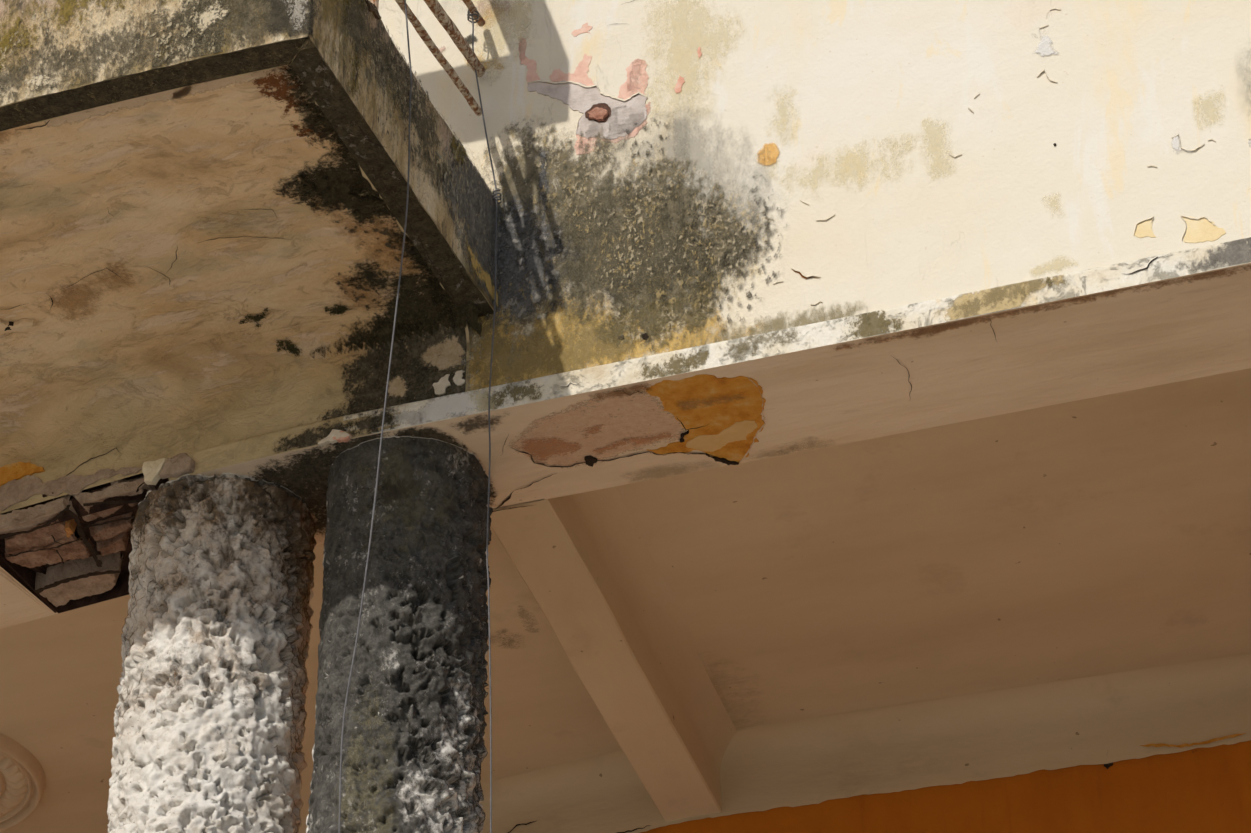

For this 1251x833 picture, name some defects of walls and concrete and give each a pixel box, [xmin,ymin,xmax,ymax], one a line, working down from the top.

flaking render [571,23,592,37]
flaking render [518,38,651,155]
peeling [1134,216,1156,238]
peeling [1180,215,1226,243]
water stain [1177,237,1251,271]
water stain [0,0,904,833]
peeling [510,374,766,468]
spalling [0,453,195,607]